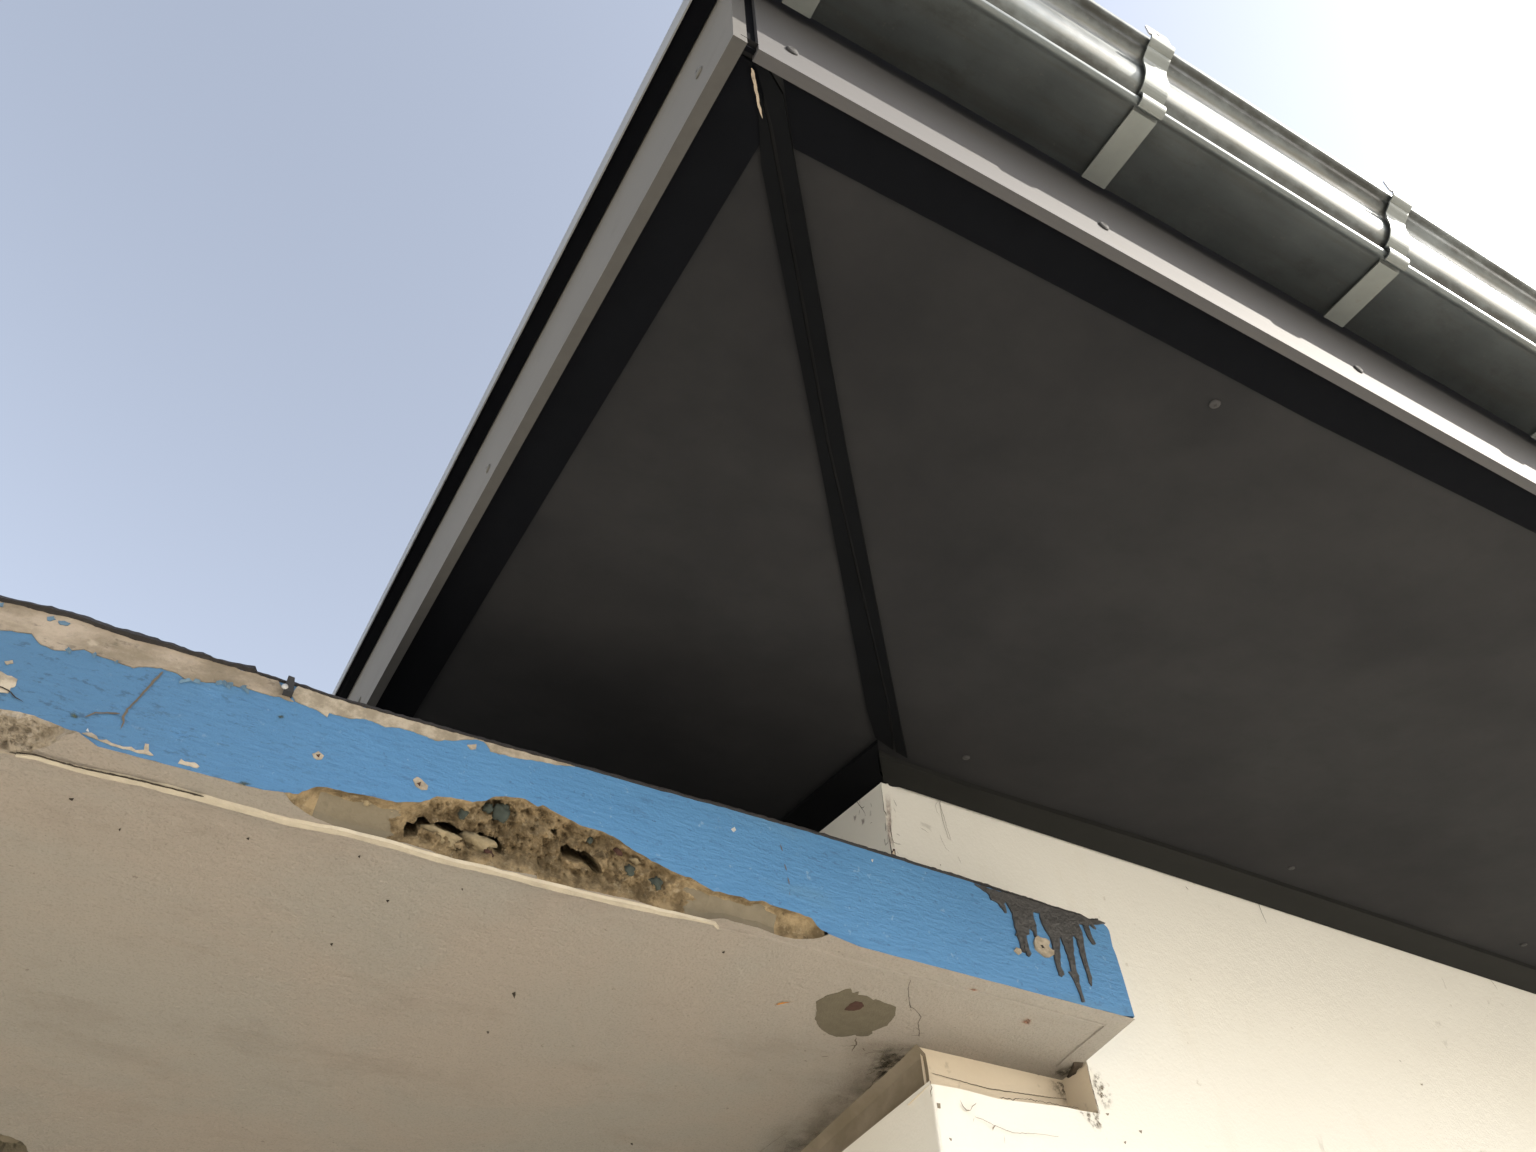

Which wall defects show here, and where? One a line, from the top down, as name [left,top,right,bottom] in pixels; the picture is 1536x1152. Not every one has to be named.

peeling [0,601,575,767]
spalling [285,777,825,939]
peeling [815,988,896,1037]
spalling [0,1134,28,1152]